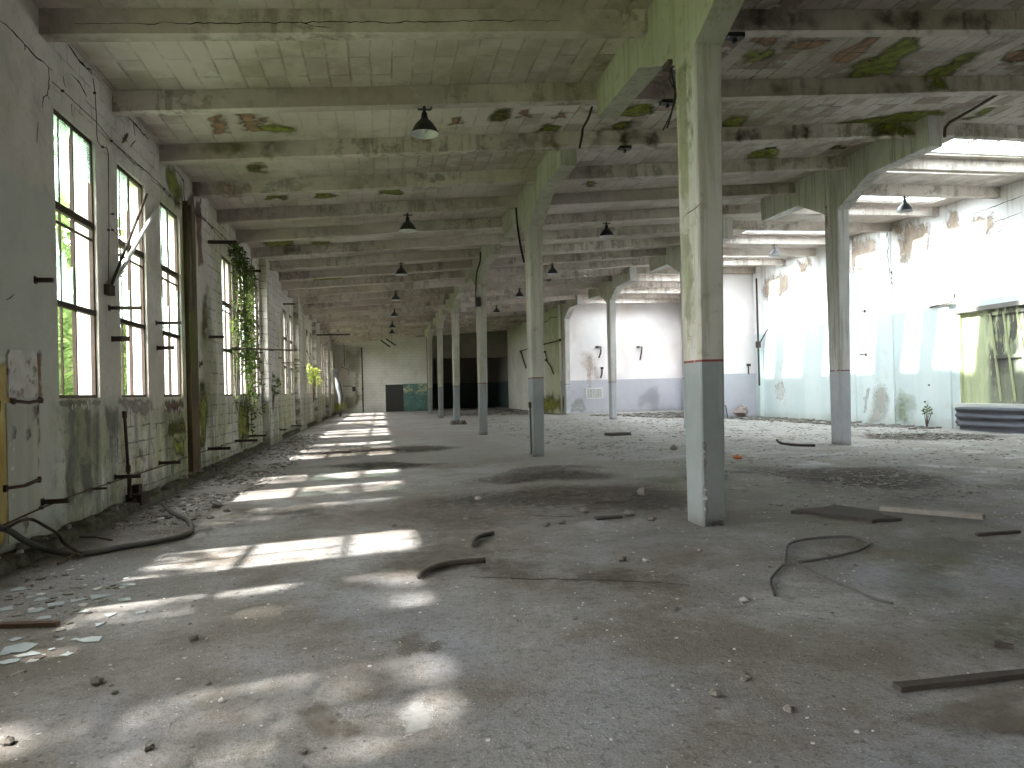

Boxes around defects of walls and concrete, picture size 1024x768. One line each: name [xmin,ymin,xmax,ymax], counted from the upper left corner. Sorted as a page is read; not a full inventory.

crack [0,20,559,136]
damp [923,76,949,91]
spalling [208,113,269,134]
damp [872,122,915,140]
damp [66,403,119,502]